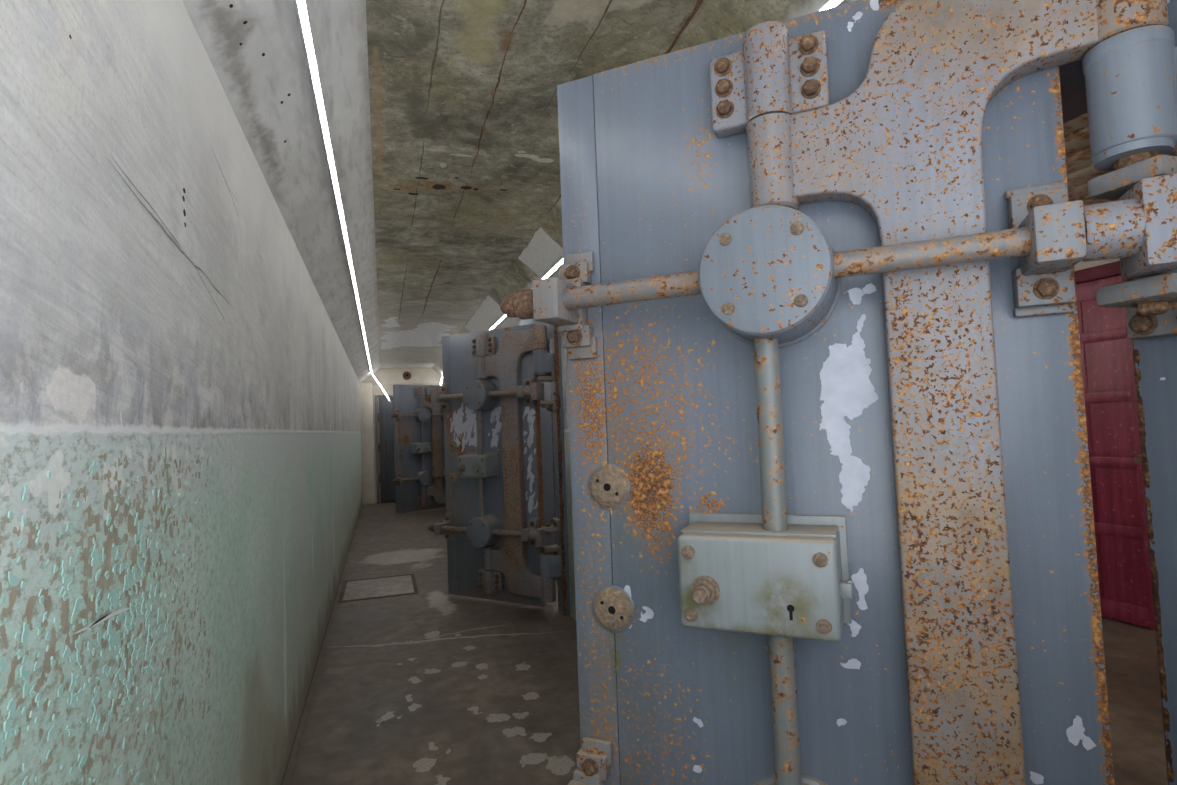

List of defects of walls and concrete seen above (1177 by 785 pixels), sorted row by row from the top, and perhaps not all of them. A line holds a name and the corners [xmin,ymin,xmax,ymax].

crack [105,154,231,323]
crack [399,0,445,319]
damp [368,0,517,177]
crack [450,0,527,230]
damp [513,150,555,163]
crack [540,0,613,117]
crack [663,0,704,55]
peeling [0,431,249,785]